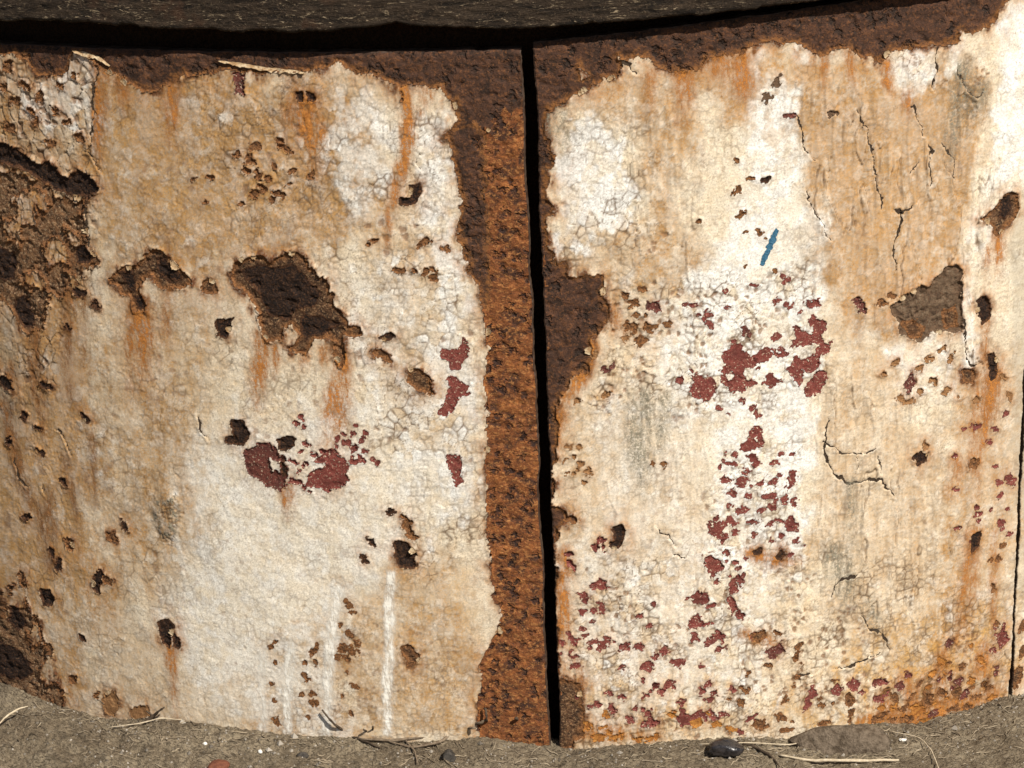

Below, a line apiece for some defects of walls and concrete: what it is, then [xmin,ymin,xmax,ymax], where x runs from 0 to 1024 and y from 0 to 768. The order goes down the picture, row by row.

peeling [0,122,102,335]
corrosion [0,44,549,746]
peeling [228,250,363,368]
spalling [224,414,380,494]
spalling [675,268,833,653]
corrosion [534,0,1010,749]
crack [797,115,816,161]
crack [823,418,894,495]
crack [857,110,913,270]
peeling [852,264,1013,445]
peeling [0,571,77,707]
spalling [559,578,1024,743]